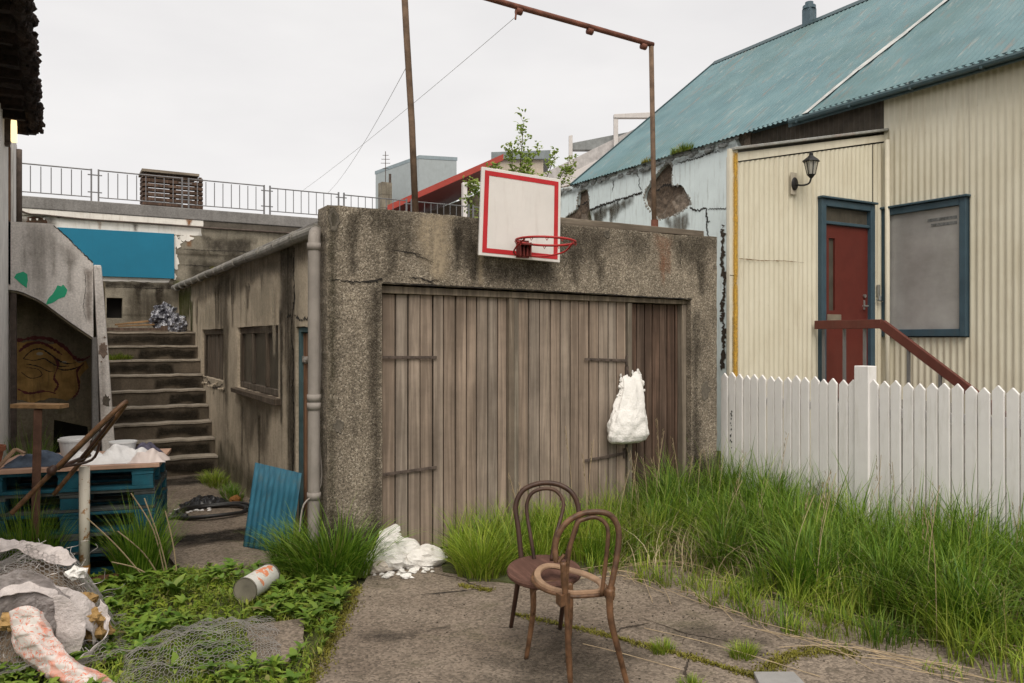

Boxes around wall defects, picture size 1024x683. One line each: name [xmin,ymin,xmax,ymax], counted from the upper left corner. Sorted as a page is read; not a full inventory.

spalling [566,189,592,220]
crack [589,174,642,220]
spalling [643,162,692,221]
peeling [174,235,194,280]
water stain [191,239,249,276]
water stain [105,250,295,490]